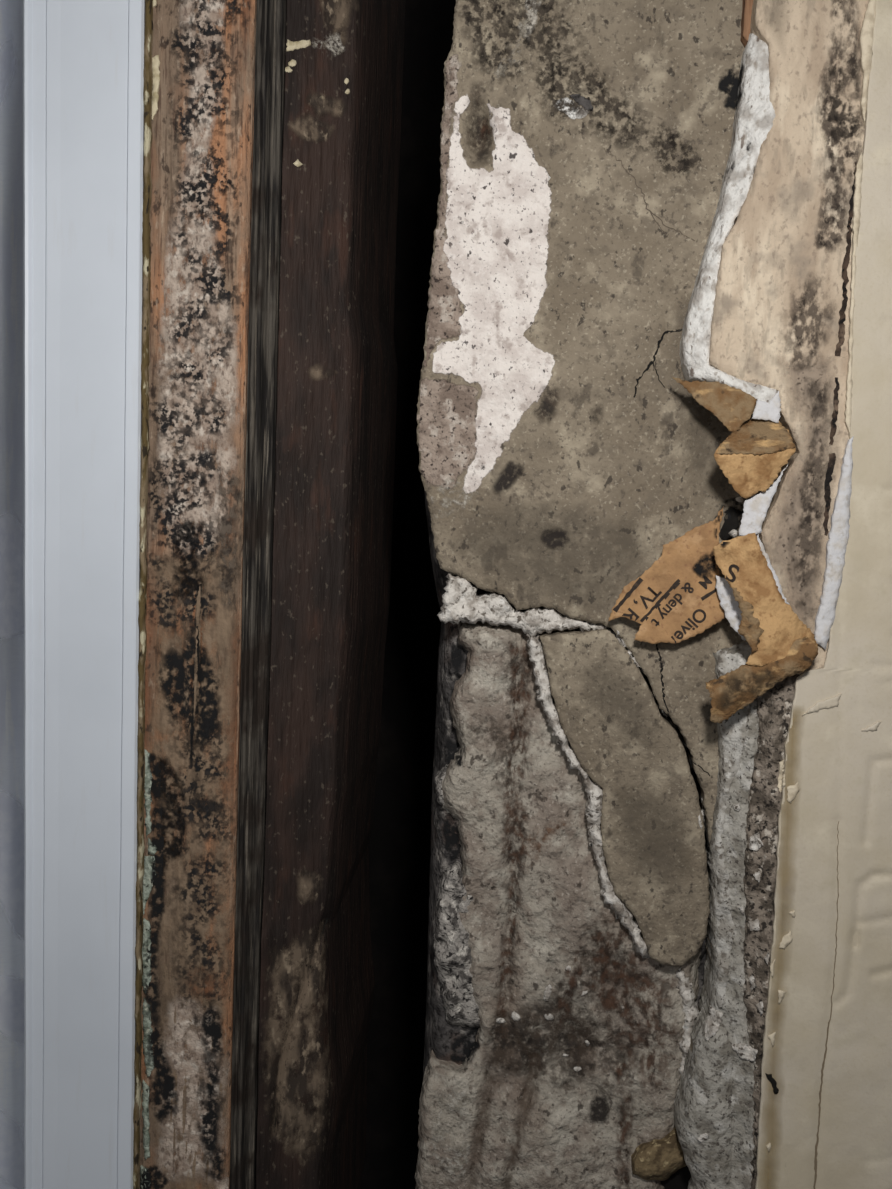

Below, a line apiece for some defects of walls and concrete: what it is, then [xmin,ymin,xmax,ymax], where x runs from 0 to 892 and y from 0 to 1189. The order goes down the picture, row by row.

mould [172,0,242,365]
peeling [417,54,555,508]
leakage [464,0,699,172]
mould [791,285,830,368]
mould [816,0,862,250]
mould [796,383,827,585]
mould [145,357,242,1179]
crack [543,624,711,888]
crack [813,821,839,1189]
mould [140,1166,167,1189]
crack [661,1166,691,1189]